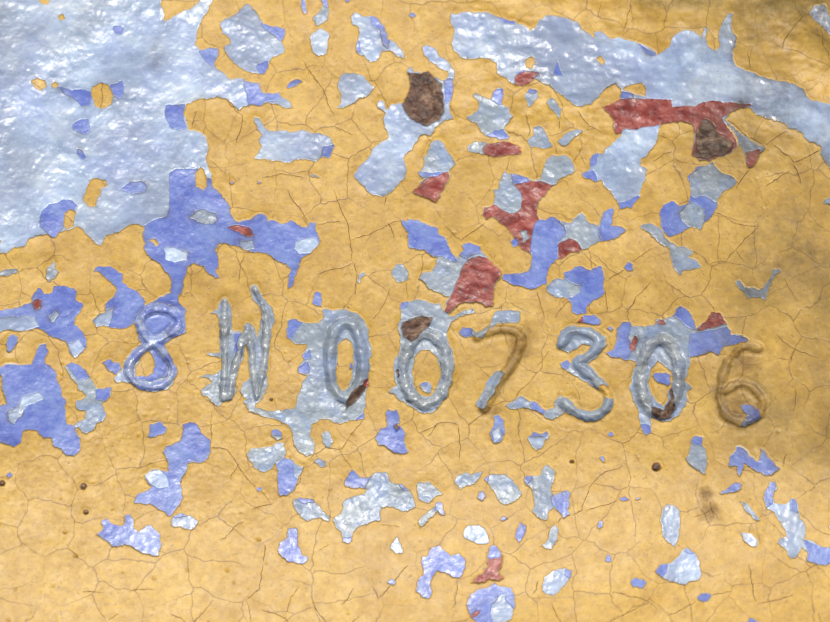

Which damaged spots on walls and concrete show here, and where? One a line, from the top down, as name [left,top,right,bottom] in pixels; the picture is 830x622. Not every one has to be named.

peeling [354,45,455,202]
crack [729,121,818,188]
peeling [0,0,320,455]
crack [262,173,395,293]
peeling [375,12,830,454]
peeling [134,422,211,529]
crack [210,414,271,541]
peeling [200,289,445,543]
crack [422,422,461,460]
crack [558,466,622,523]
peeling [721,447,830,565]
crack [246,548,326,622]